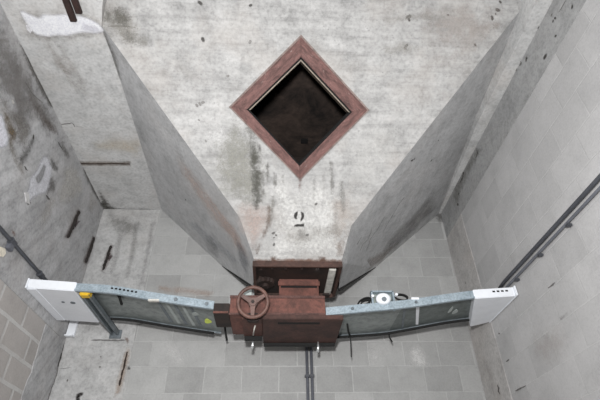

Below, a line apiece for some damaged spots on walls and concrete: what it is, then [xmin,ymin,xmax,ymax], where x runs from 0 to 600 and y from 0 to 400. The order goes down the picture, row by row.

peeling [21,12,106,37]
peeling [24,157,52,204]
leakage [223,132,269,206]